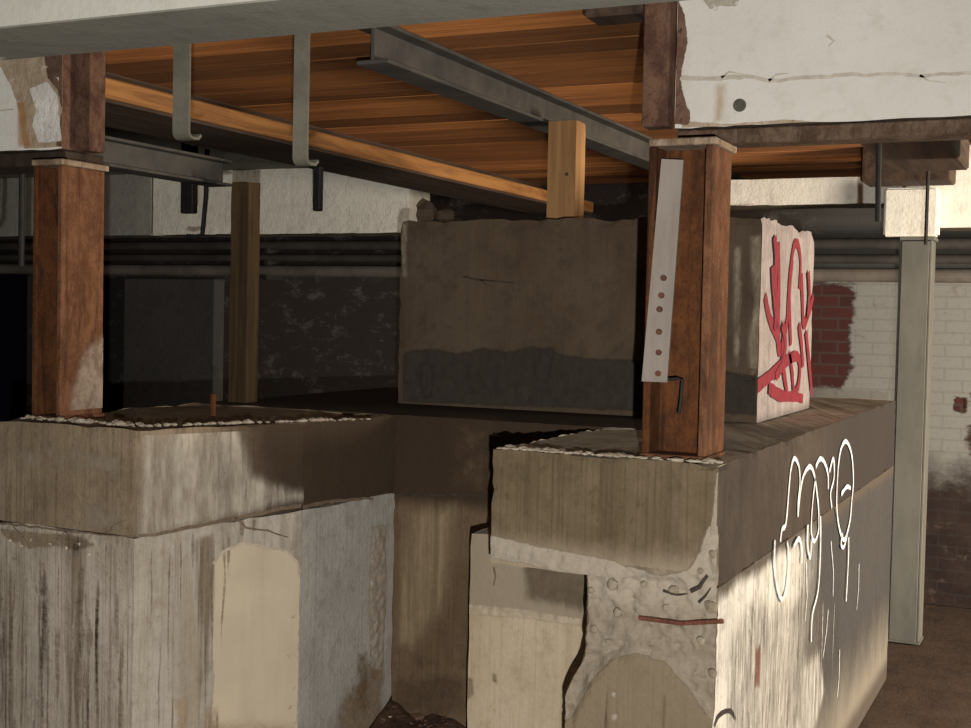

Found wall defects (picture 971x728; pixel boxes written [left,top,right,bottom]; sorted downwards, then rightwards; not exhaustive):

peeling [0,55,63,149]
spalling [675,0,809,128]
crack [681,71,971,83]
water stain [403,347,643,410]
peeling [811,282,856,389]
peeling [954,394,971,413]
water stain [63,541,98,728]
water stain [182,538,212,728]
spalling [490,472,724,720]